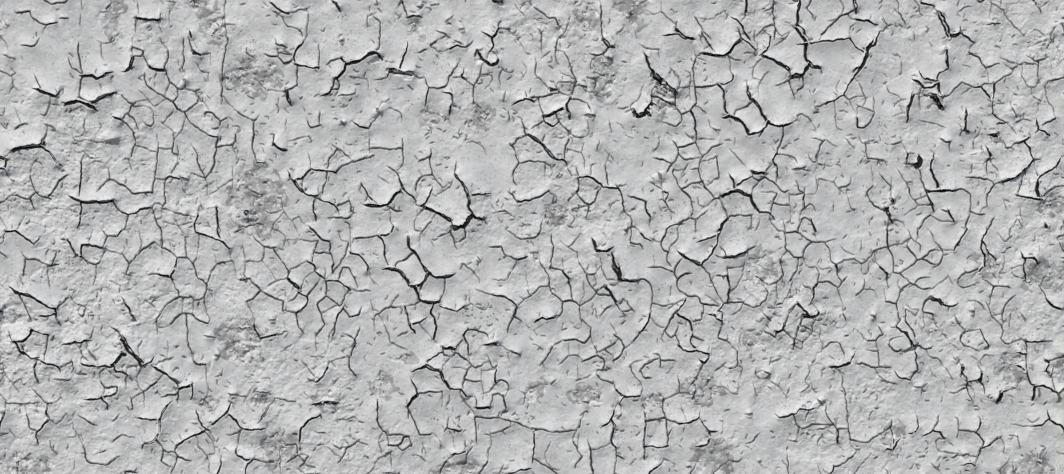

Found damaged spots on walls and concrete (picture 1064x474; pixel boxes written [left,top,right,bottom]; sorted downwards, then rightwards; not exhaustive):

crack [16,0,83,47]
crack [134,1,170,43]
crack [573,1,626,66]
crack [0,20,27,133]
crack [210,0,321,167]
crack [0,218,40,259]
crack [1012,252,1039,283]
crack [1039,266,1062,310]
crack [749,343,790,401]
crack [365,393,413,474]
crack [999,435,1046,474]
crack [1012,402,1064,429]